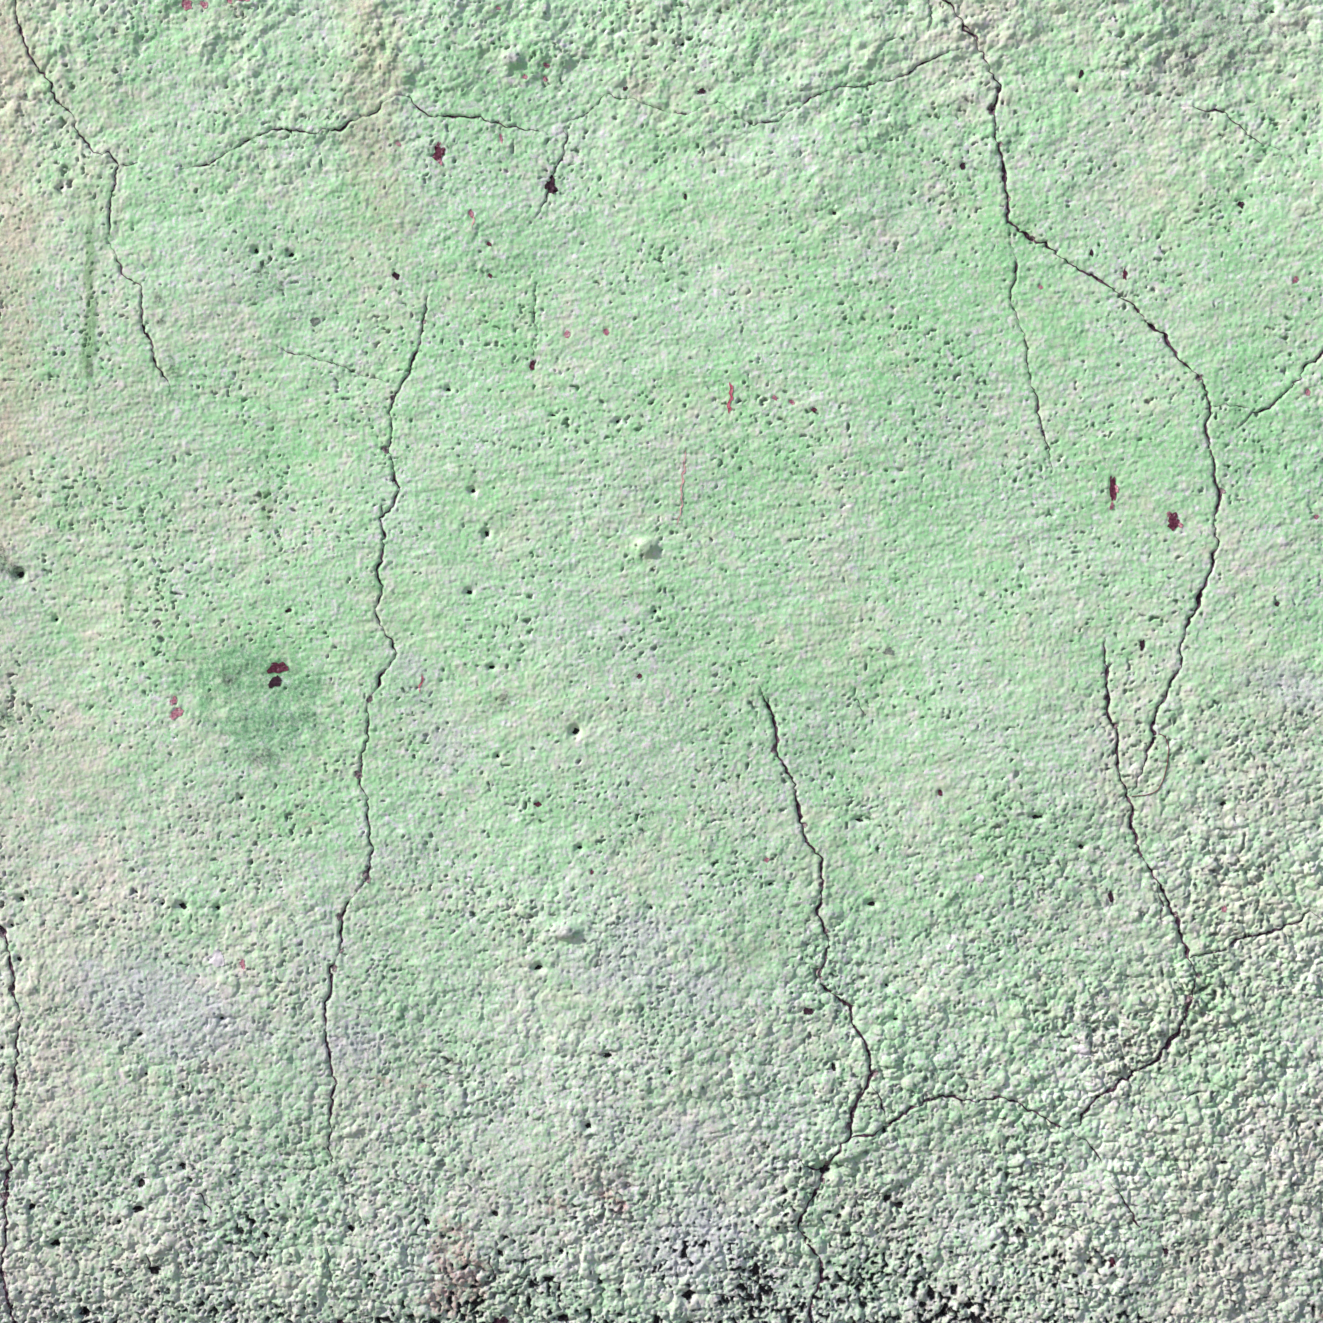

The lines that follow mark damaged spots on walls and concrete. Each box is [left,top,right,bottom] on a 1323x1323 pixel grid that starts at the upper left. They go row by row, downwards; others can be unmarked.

crack [15,0,170,391]
crack [185,93,629,218]
crack [646,0,1323,1323]
crack [276,296,428,1173]
crack [0,926,21,1323]
damp [138,1253,238,1323]
damp [196,1200,297,1276]
damp [260,1244,637,1323]
damp [637,1189,1166,1323]